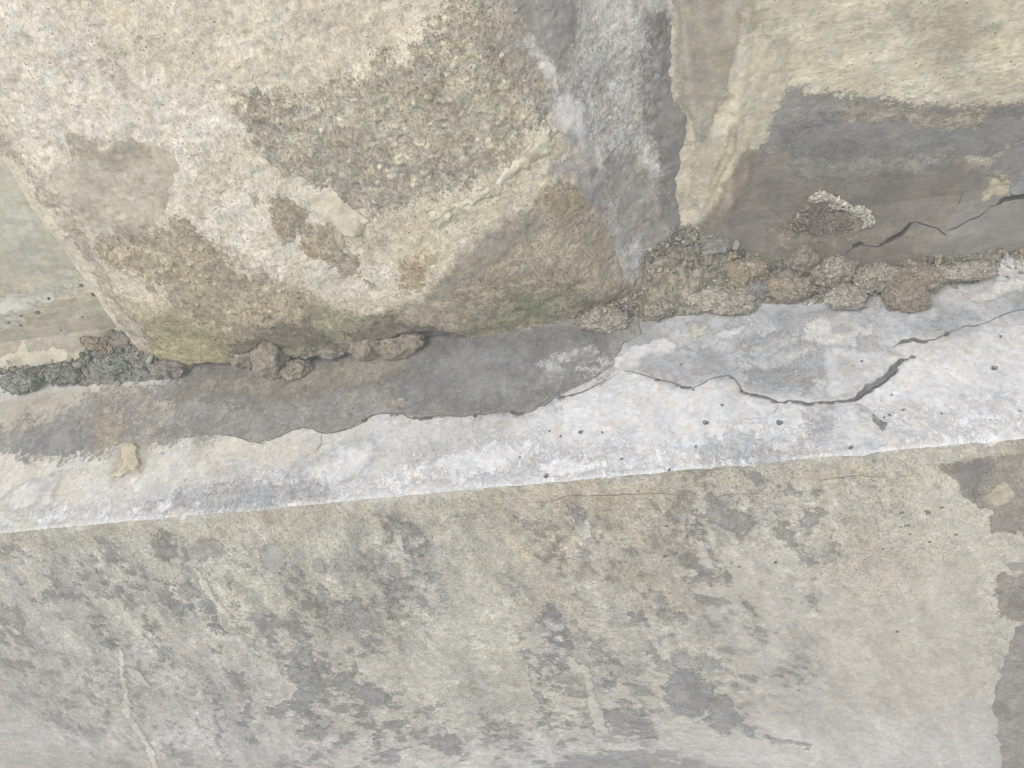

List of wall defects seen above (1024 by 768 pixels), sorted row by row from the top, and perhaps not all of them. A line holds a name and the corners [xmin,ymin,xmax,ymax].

flaking render [0,132,792,467]
leakage [228,0,1024,357]
spalling [800,274,832,306]
crack [844,193,1024,254]
spalling [892,248,1024,289]
crack [154,309,1024,461]
leakage [991,562,1024,768]